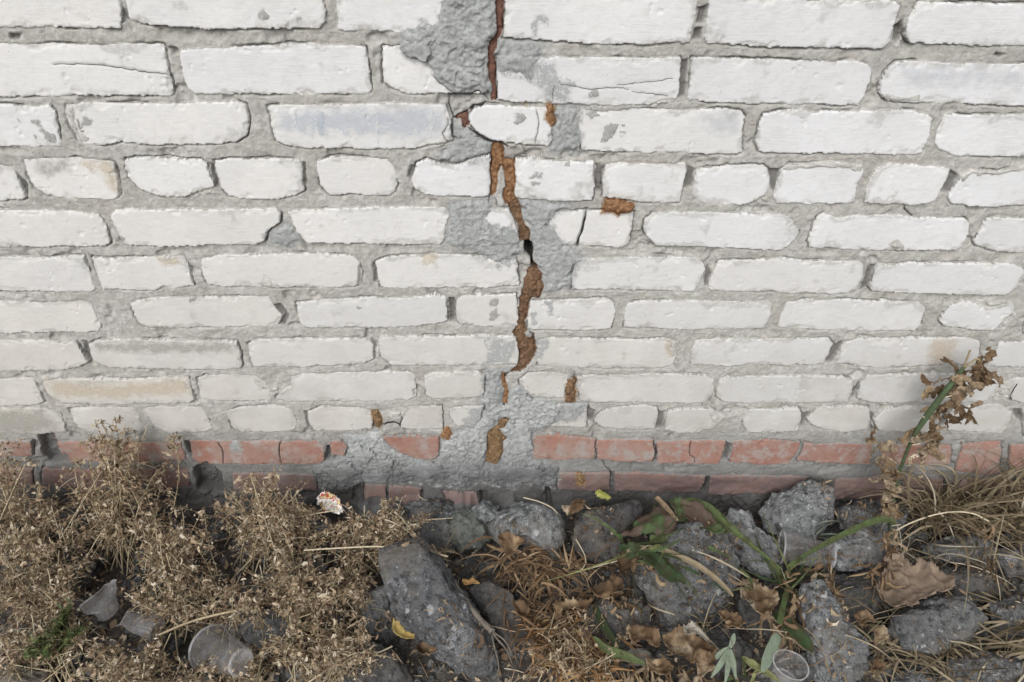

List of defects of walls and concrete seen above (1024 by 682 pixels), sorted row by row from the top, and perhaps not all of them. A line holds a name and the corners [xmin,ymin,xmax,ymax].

peeling [400,39,432,62]
crack [434,0,669,464]